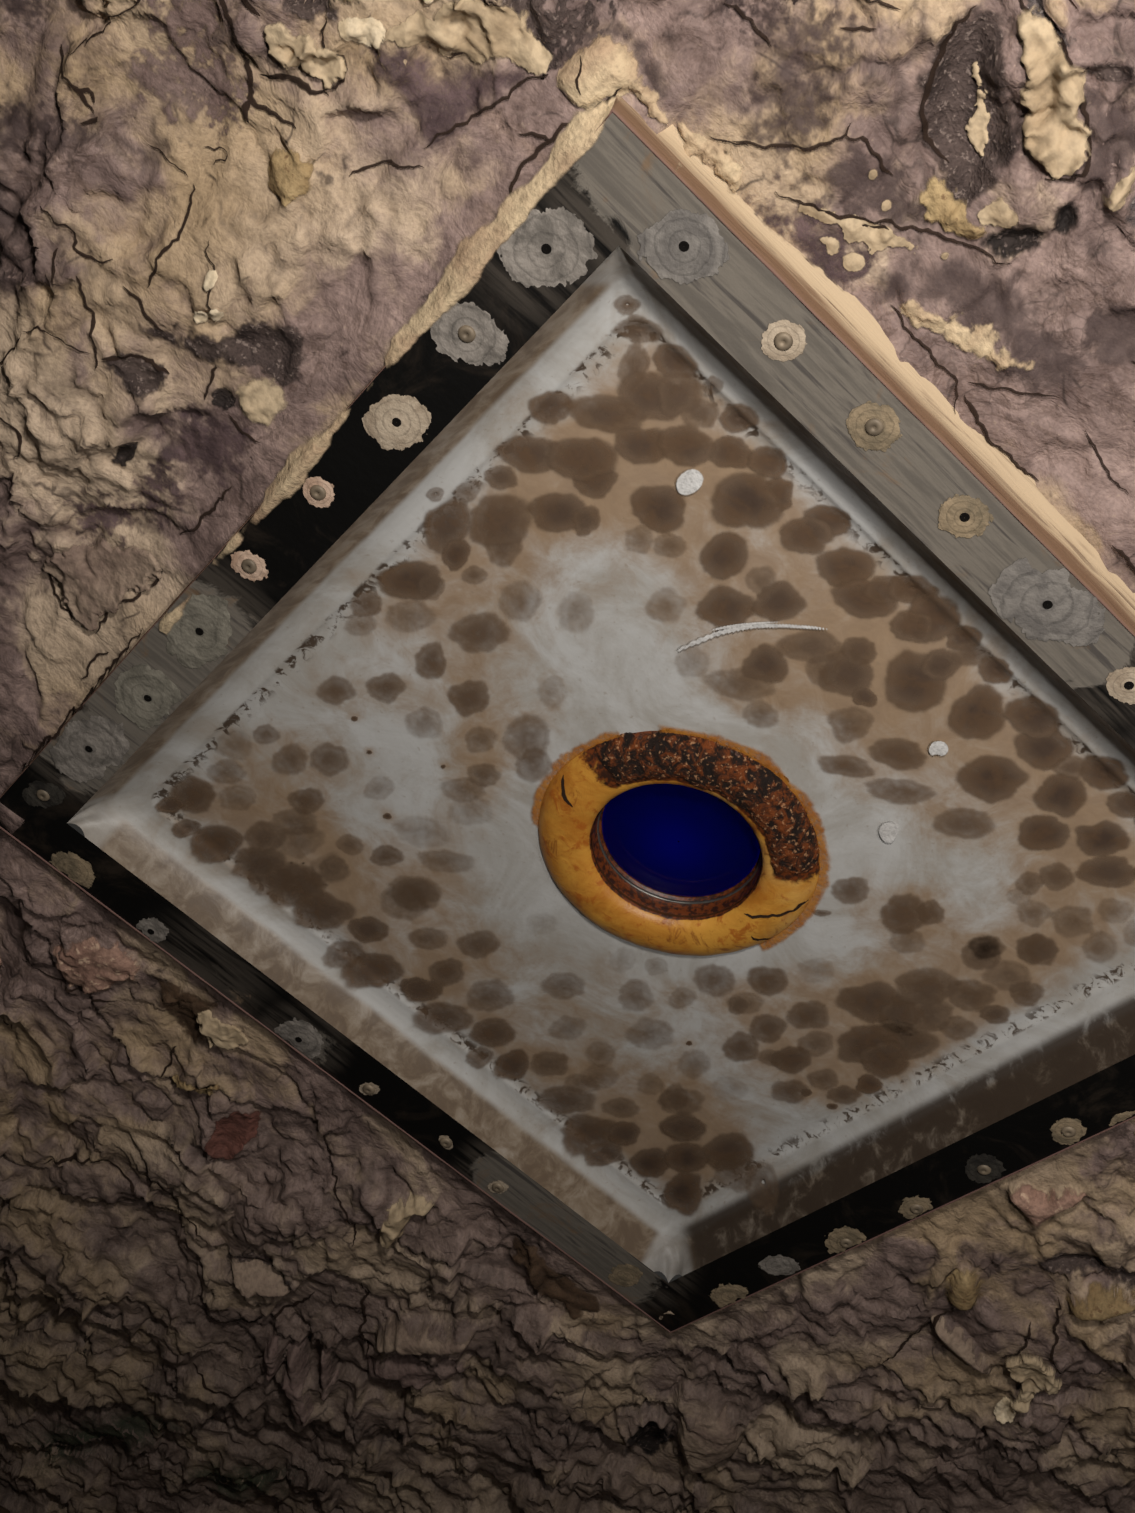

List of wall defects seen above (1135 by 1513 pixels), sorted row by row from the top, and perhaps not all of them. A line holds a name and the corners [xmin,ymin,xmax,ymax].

crack [0,0,348,374]
crack [349,56,622,196]
crack [709,123,893,176]
peeling [798,200,914,272]
crack [775,191,1012,264]
flaking render [918,0,1135,259]
crack [1020,0,1092,182]
water stain [353,296,1135,889]
water stain [156,776,771,1215]
rust [532,727,829,949]
water stain [699,934,1056,1109]
water stain [882,895,943,933]